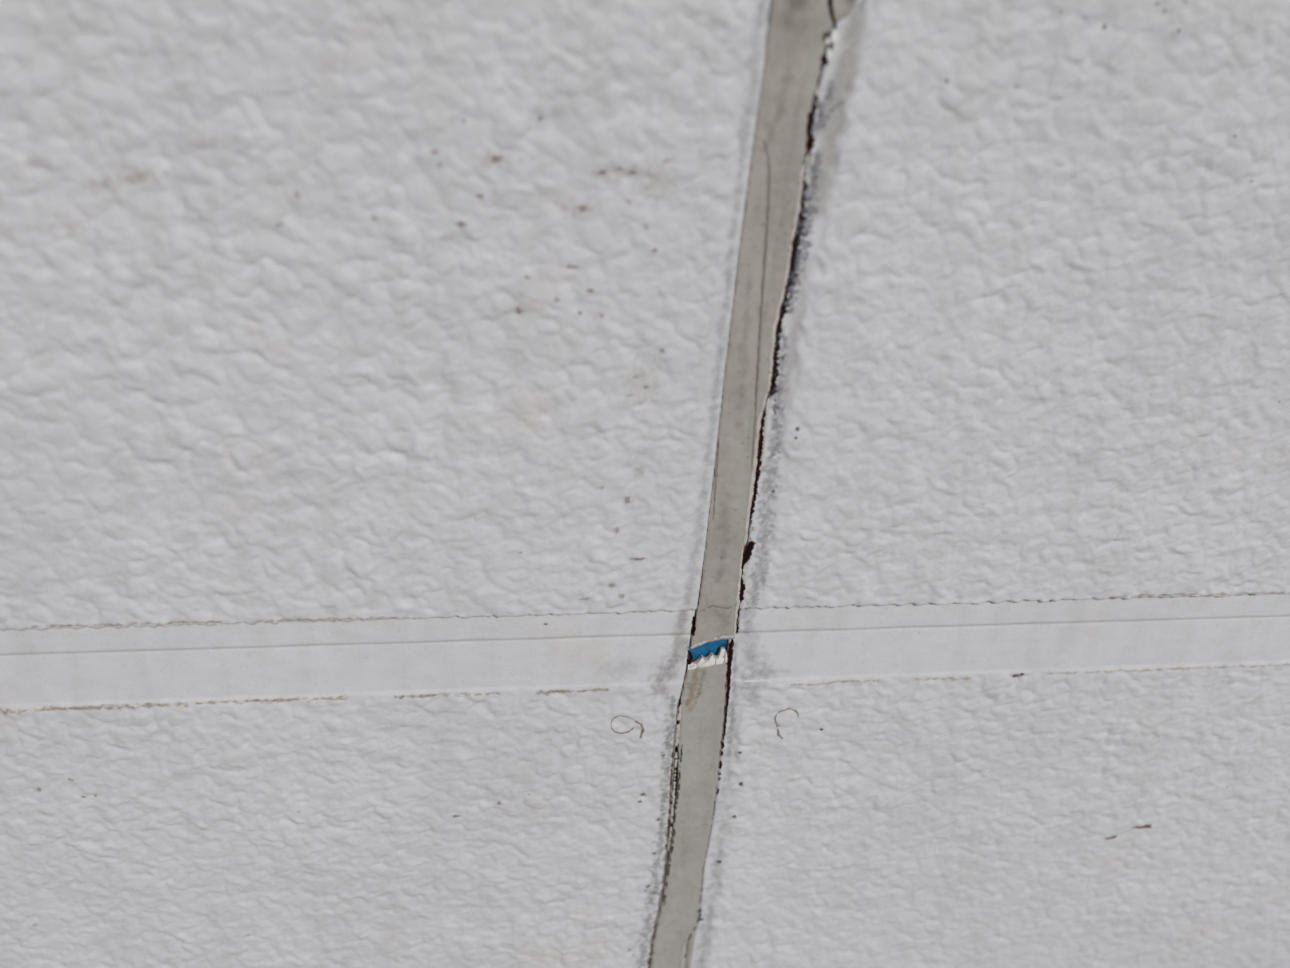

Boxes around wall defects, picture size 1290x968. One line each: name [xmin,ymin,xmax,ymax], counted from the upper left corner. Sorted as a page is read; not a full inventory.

peeling [688,648,727,670]
crack [611,0,845,968]